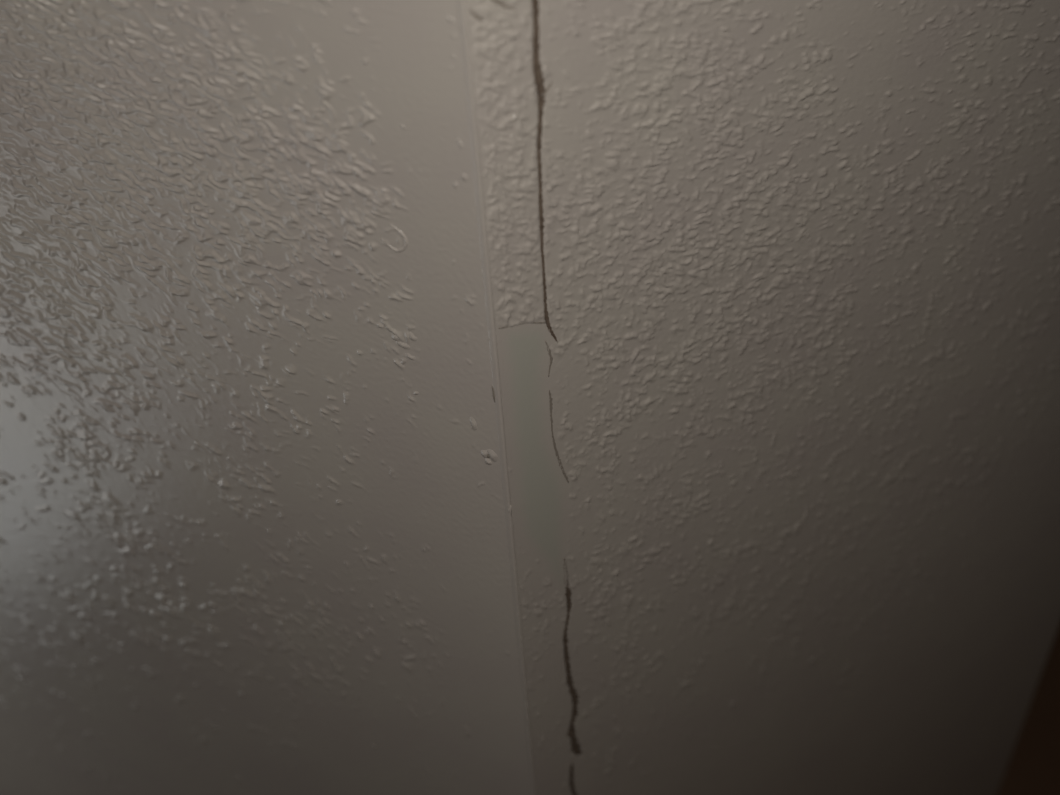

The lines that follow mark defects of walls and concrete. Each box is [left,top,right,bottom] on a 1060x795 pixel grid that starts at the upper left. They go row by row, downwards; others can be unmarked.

crack [563,558,582,795]